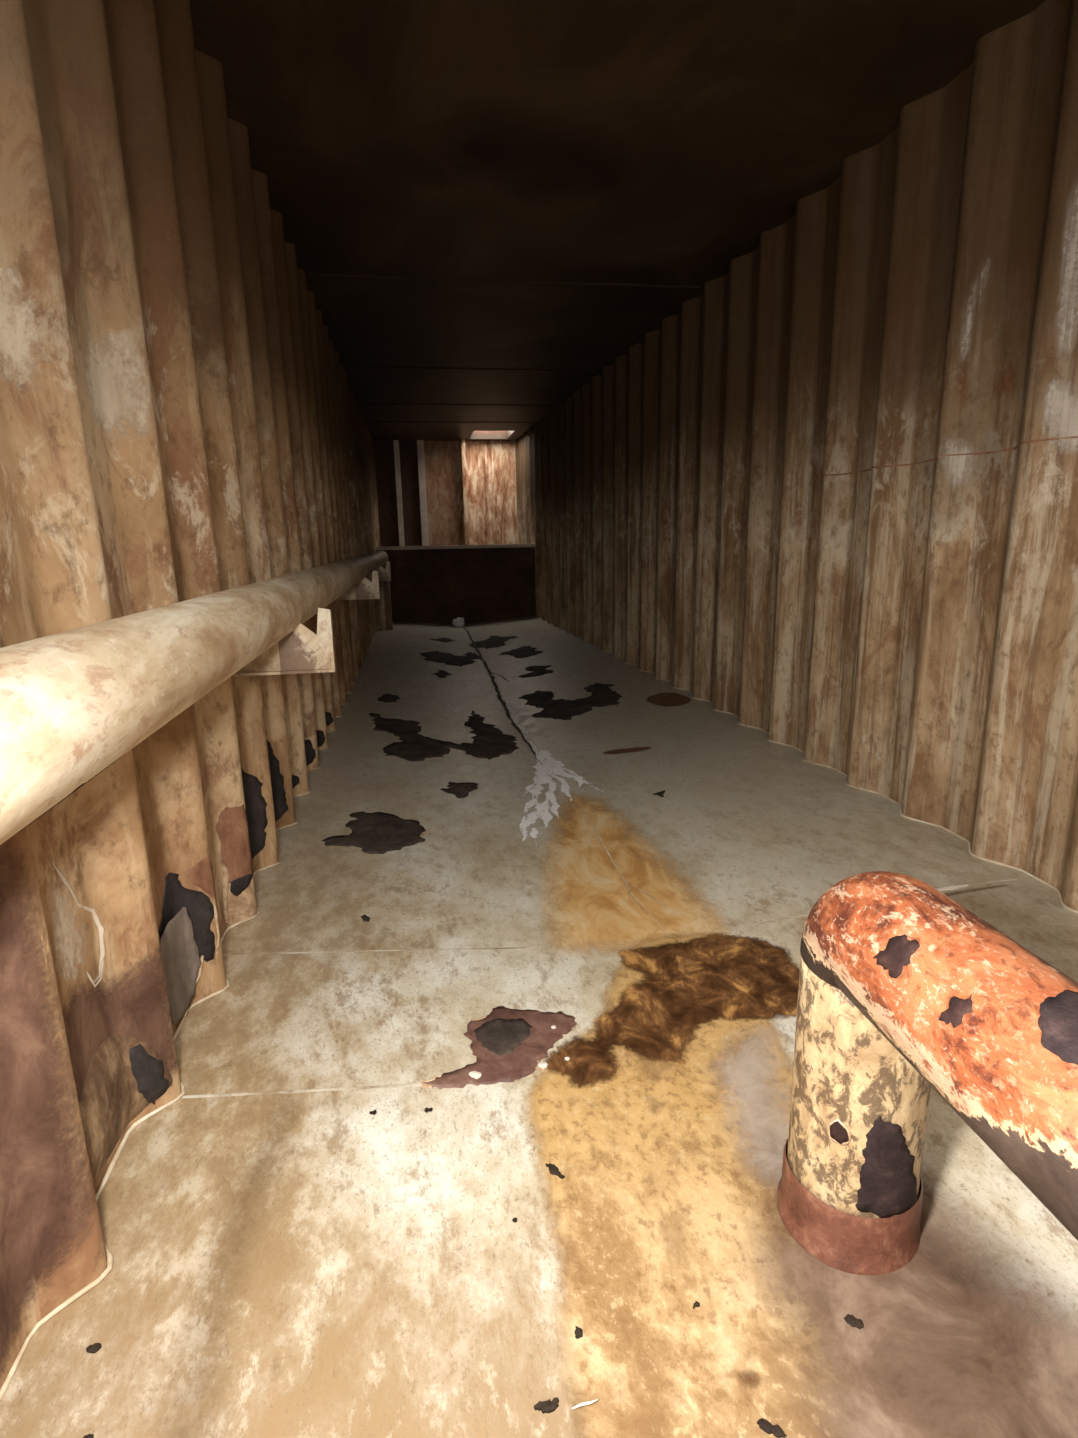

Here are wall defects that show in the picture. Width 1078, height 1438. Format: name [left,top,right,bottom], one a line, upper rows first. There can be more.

damp [1061,198,1078,348]
efflorescence [1045,384,1078,450]
peeling [158,712,333,1026]
peeling [322,811,431,854]
peeling [369,694,519,762]
peeling [419,635,623,720]
crack [462,627,685,926]
rust [544,796,723,1041]
peeling [419,1006,577,1089]
rust [529,1017,838,1438]